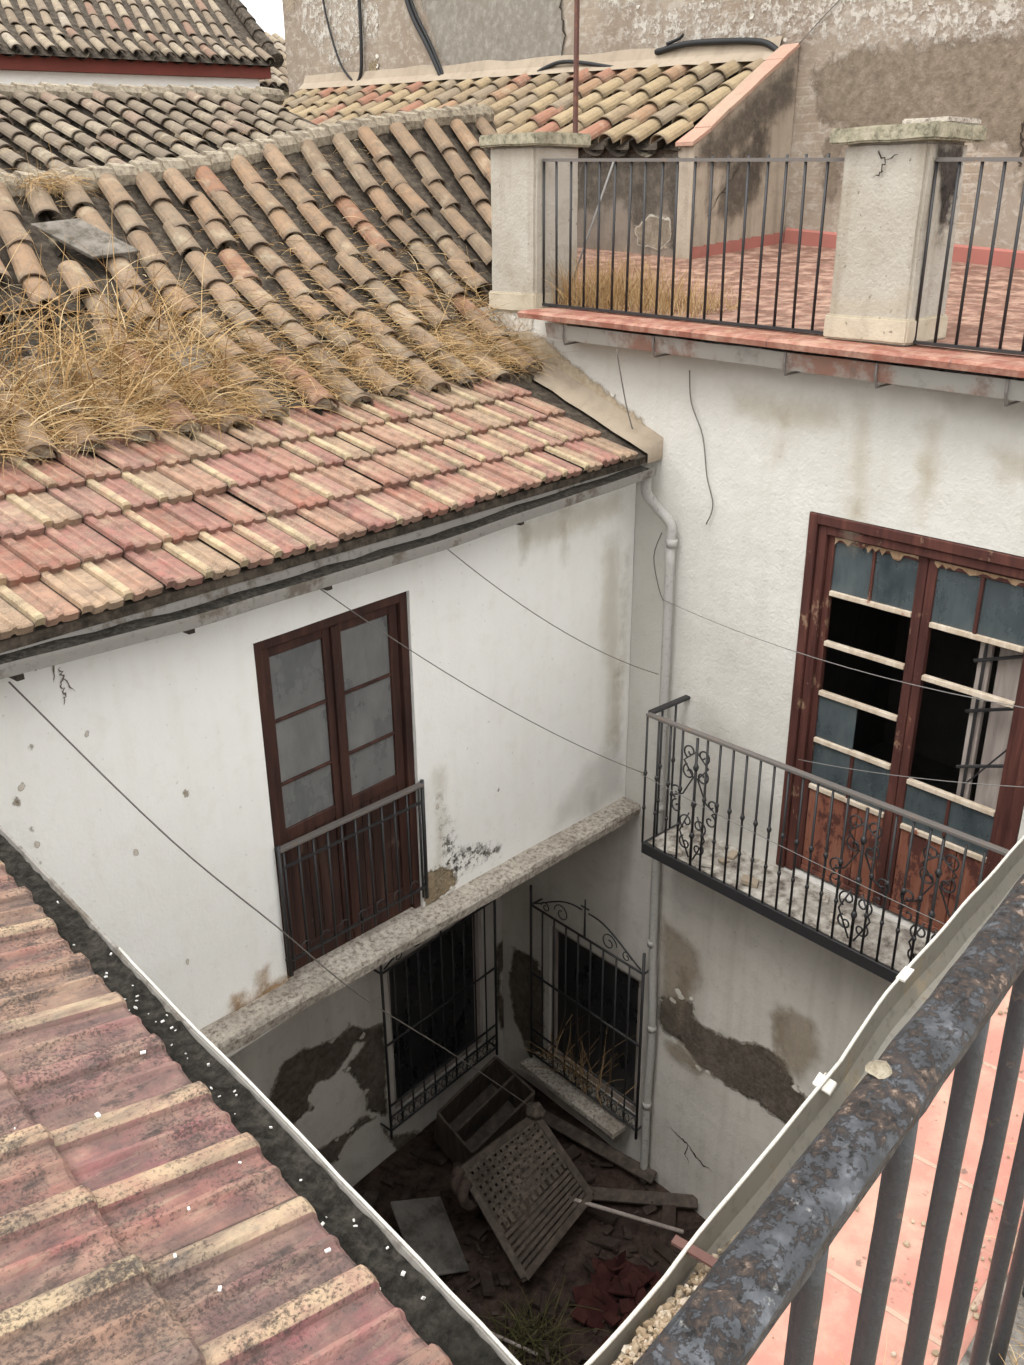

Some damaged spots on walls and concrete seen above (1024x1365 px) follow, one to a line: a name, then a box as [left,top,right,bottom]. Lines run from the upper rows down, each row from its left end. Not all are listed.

crack [558,0,566,56]
crack [53,666,76,704]
flaking render [424,864,459,906]
peeling [657,988,808,1124]
peeling [267,1022,423,1169]